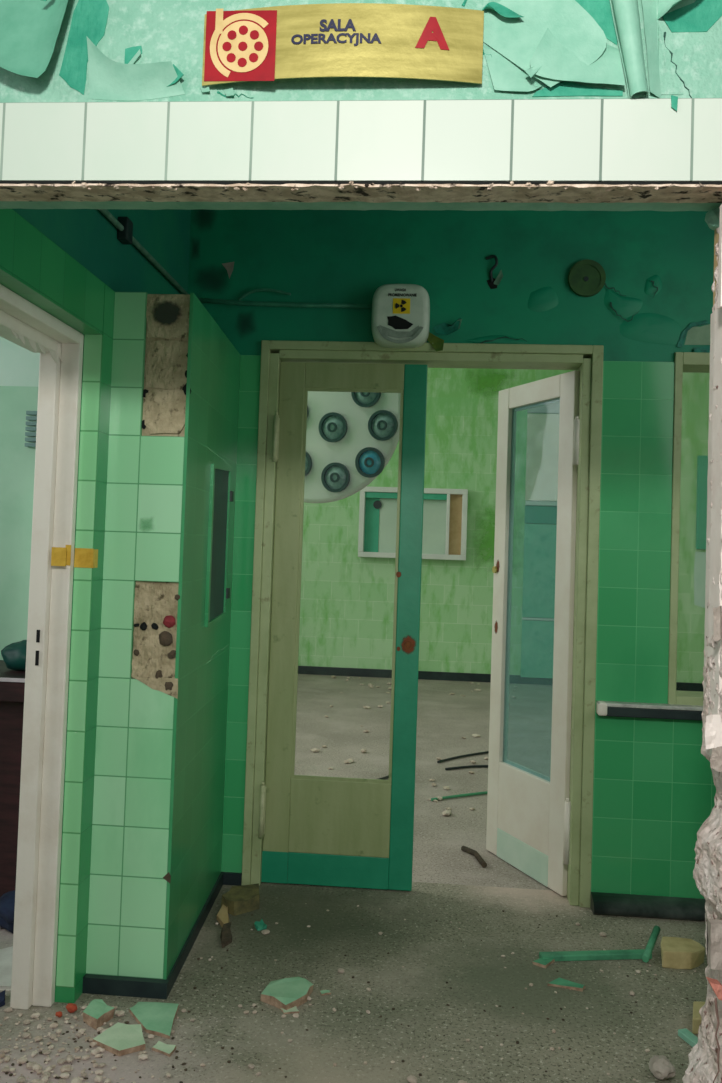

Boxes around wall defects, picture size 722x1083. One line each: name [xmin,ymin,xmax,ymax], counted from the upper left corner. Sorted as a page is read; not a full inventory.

peeling [0,0,185,101]
peeling [482,0,722,111]
spalling [0,180,722,772]
leakage [479,520,495,561]
spalling [706,918,722,1083]